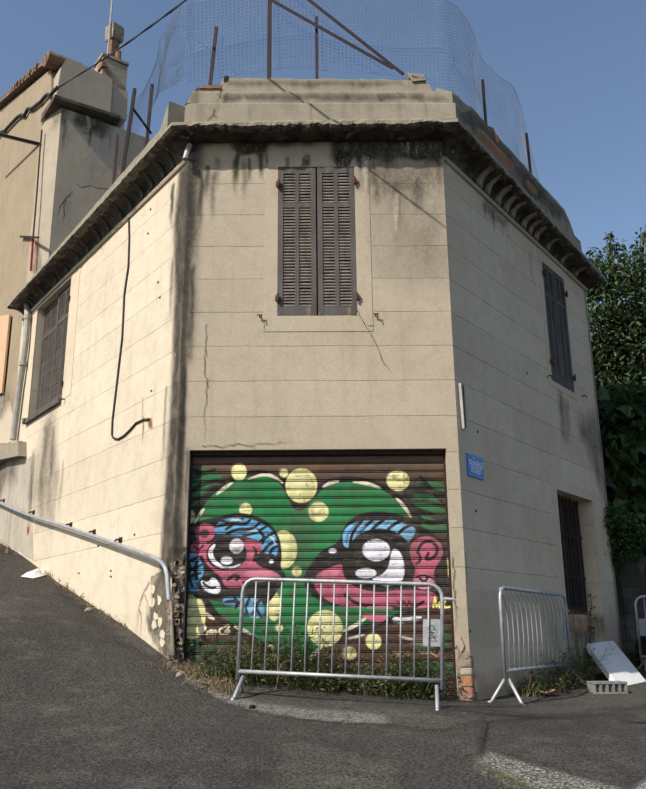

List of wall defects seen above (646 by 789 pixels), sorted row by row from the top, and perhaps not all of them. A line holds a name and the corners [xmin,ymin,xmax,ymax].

leakage [233,141,314,177]
leakage [333,139,444,174]
leakage [147,142,210,656]
crack [202,324,284,448]
spalling [148,546,187,662]
spalling [454,631,479,701]